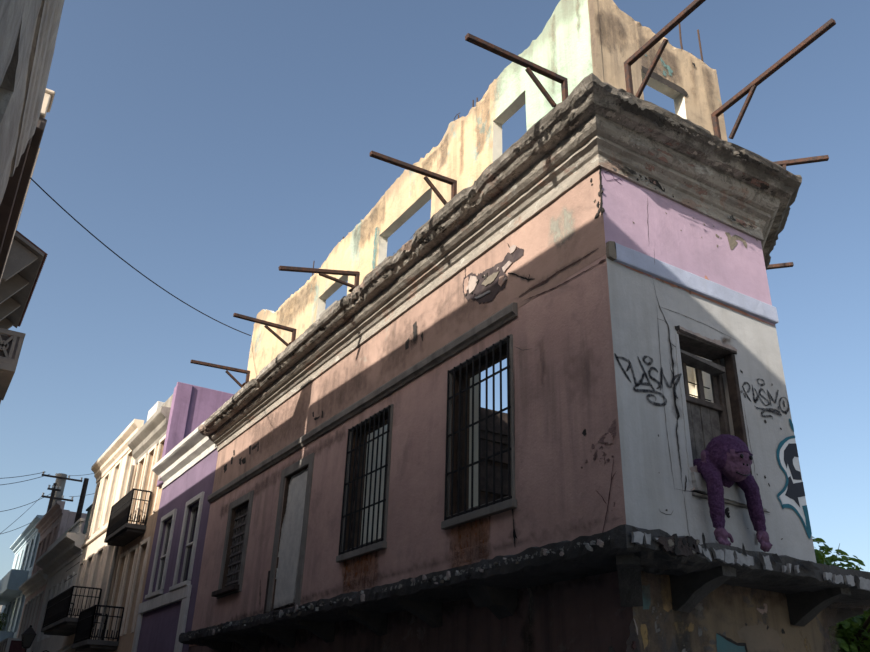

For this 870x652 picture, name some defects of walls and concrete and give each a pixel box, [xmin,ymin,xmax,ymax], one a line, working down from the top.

peeling [358,171,513,297]
spalling [463,245,524,304]
spalling [590,167,621,219]
peeling [701,224,758,250]
crack [647,198,728,536]
spalling [181,419,616,638]